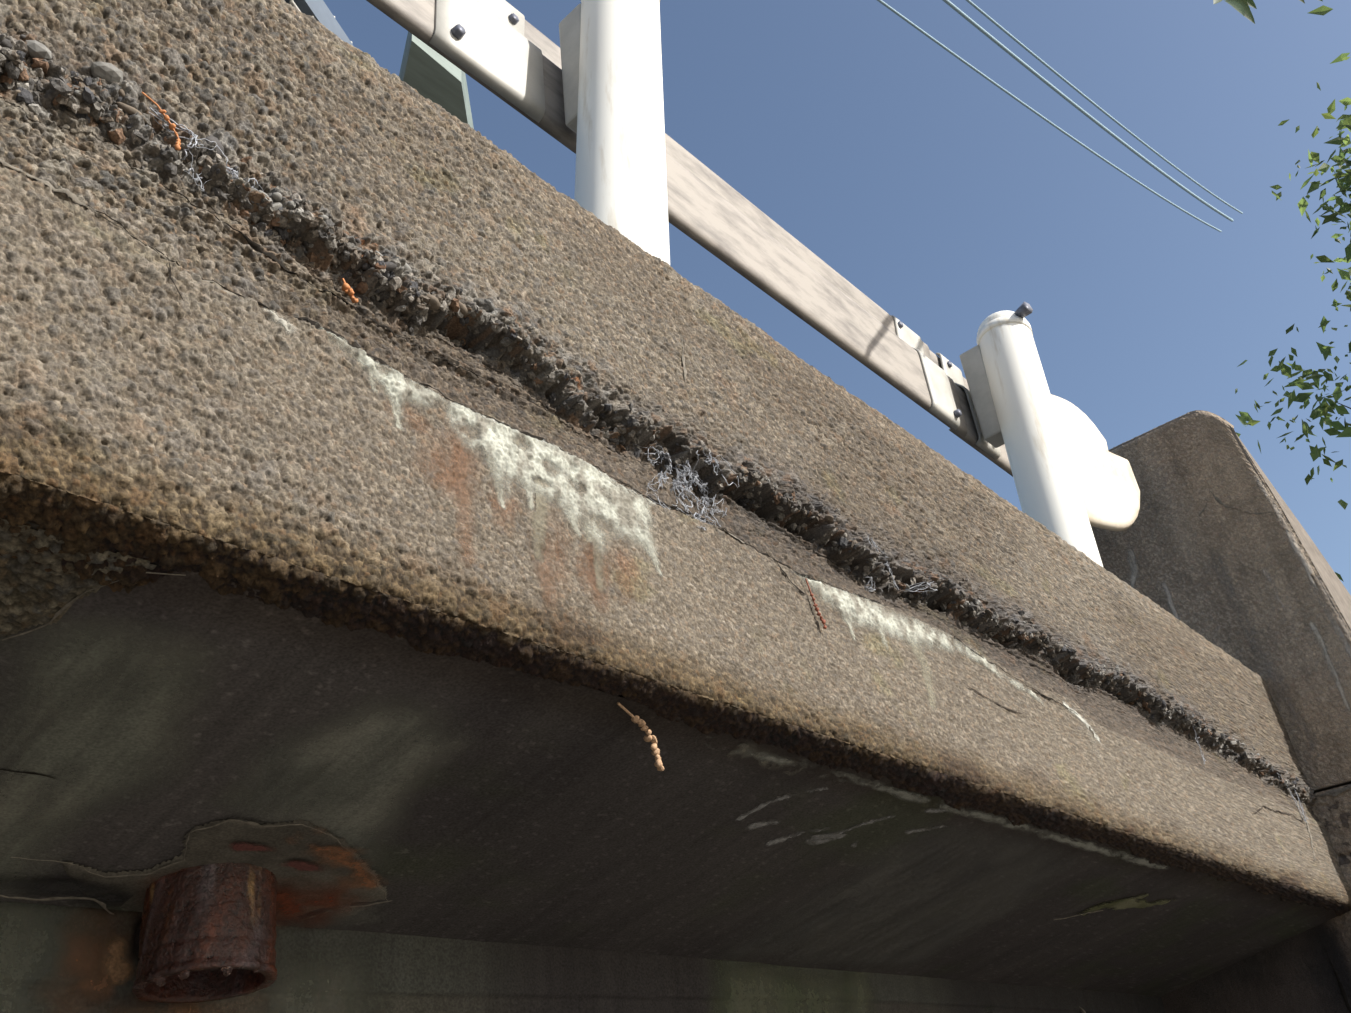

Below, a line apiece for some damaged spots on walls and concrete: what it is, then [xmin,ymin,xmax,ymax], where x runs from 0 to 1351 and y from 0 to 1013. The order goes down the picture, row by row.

leakage [327,332,662,575]
crack [0,158,1077,714]
leakage [802,577,997,706]